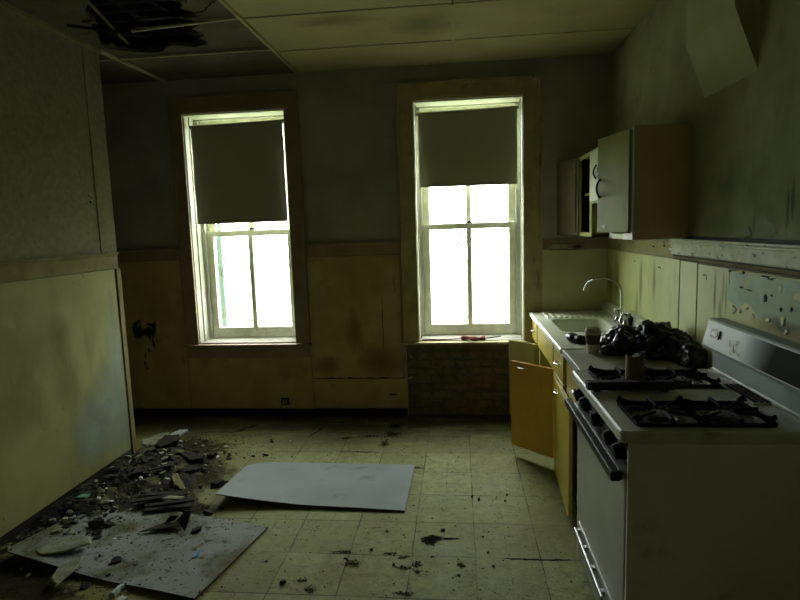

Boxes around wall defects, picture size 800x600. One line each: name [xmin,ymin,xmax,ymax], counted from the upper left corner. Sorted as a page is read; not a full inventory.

peeling [728,269,800,335]